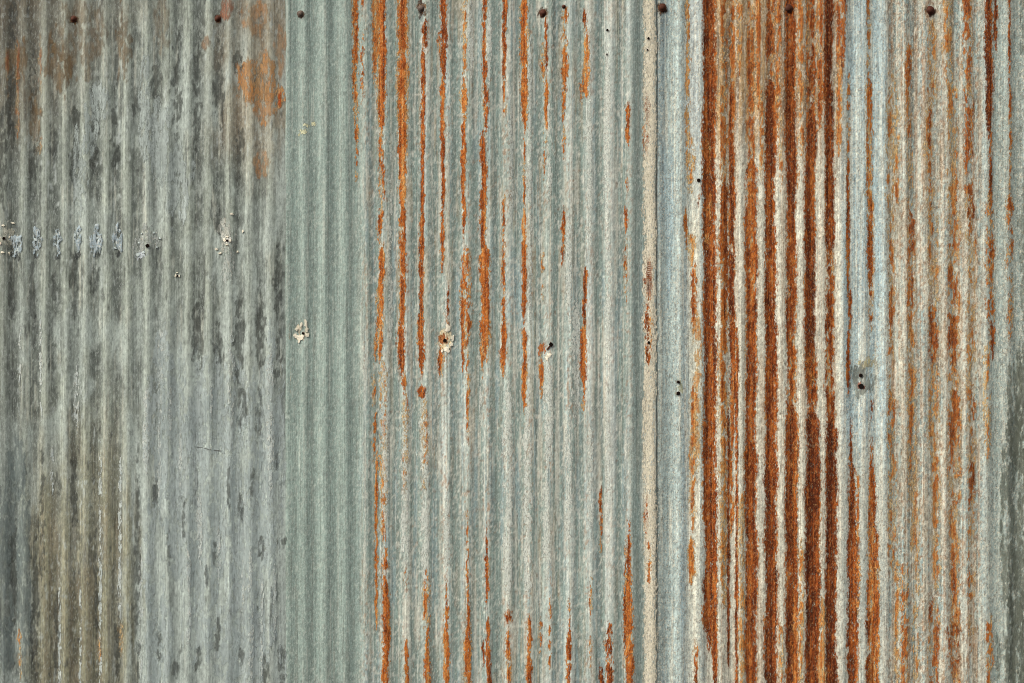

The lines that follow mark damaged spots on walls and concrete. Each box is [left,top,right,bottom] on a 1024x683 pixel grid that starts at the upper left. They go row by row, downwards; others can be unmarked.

corrosion [235,50,286,126]
corrosion [446,0,508,440]
corrosion [501,0,591,415]
corrosion [625,98,650,156]
corrosion [351,0,448,683]
corrosion [683,0,1014,683]
corrosion [422,510,492,683]
corrosion [504,609,513,683]
corrosion [525,598,552,683]
corrosion [588,502,652,683]